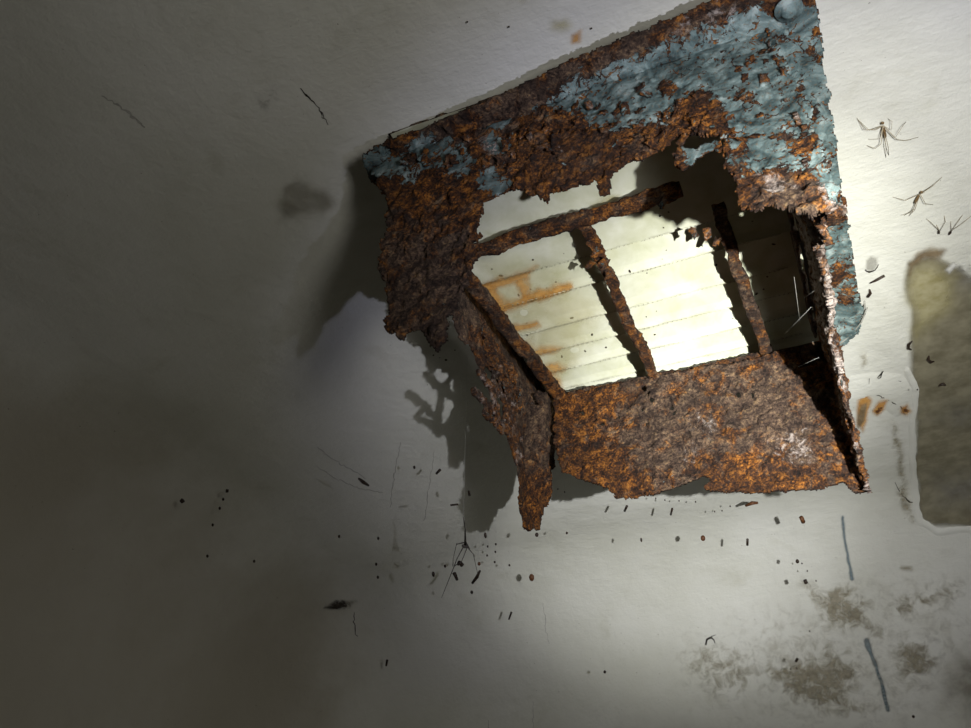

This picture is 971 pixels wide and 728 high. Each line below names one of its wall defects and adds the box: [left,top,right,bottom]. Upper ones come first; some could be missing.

corrosion [734,48,771,88]
corrosion [484,82,778,165]
corrosion [399,132,474,169]
corrosion [688,226,722,247]
corrosion [585,238,612,277]
corrosion [482,272,572,312]
flaking render [902,258,971,536]
leakage [824,590,862,622]
leakage [776,659,853,704]